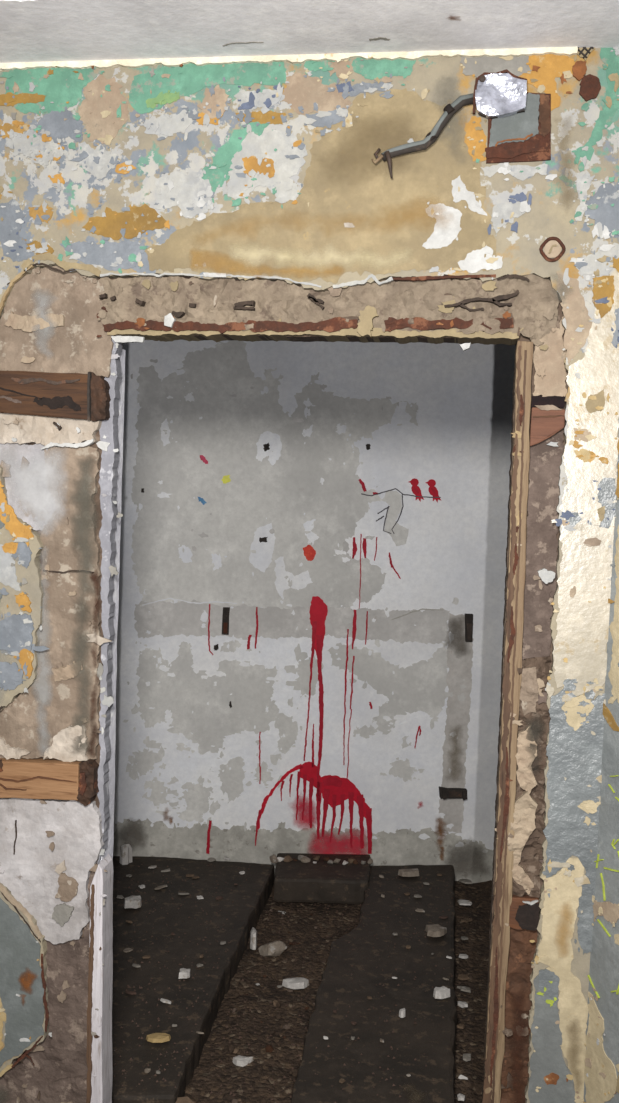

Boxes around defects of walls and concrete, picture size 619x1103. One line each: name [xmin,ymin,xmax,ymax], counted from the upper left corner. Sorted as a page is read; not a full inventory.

peeling [0,66,136,182]
peeling [460,54,601,112]
peeling [571,47,619,172]
peeling [0,196,54,268]
peeling [48,173,65,192]
peeling [569,172,619,242]
rust [96,306,358,337]
peeling [14,591,32,613]
peeling [122,340,481,788]
peeling [0,611,34,691]
peeling [113,641,360,877]
peeling [361,798,494,883]